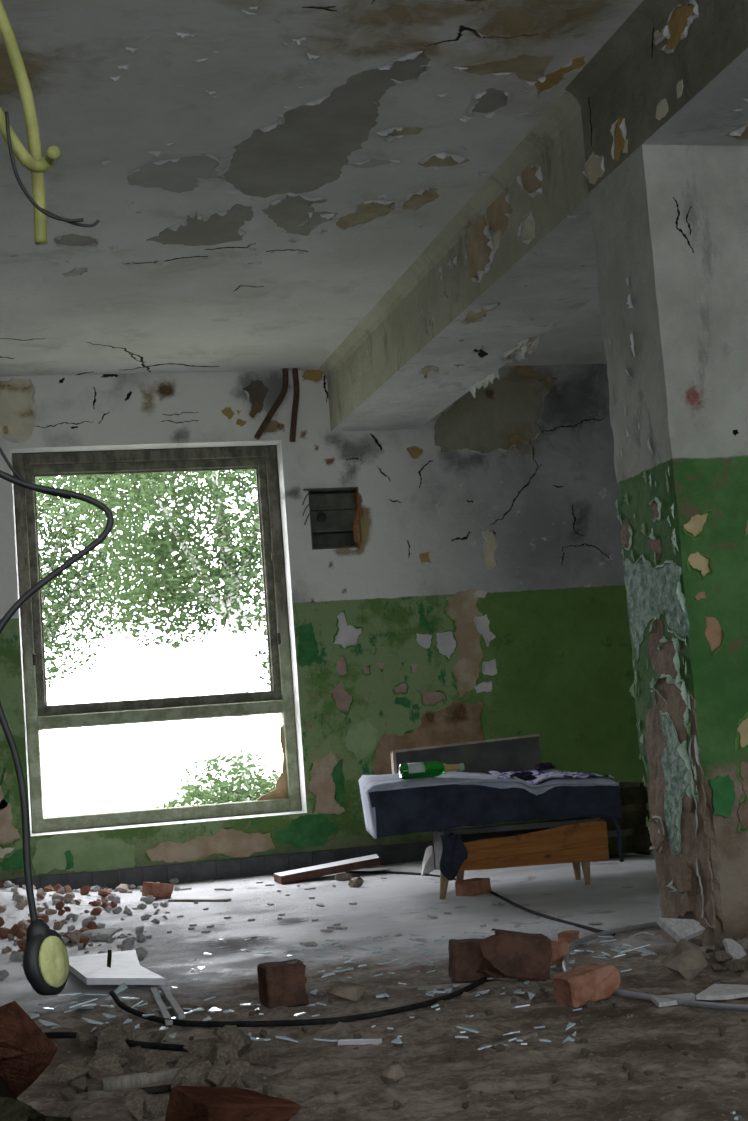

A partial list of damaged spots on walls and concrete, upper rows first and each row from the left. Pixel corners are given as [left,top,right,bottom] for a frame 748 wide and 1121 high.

crack [302,4,337,12]
crack [428,0,539,46]
peeling [653,0,700,54]
peeling [454,54,587,120]
peeling [655,80,683,120]
peeling [127,49,439,246]
peeling [583,117,628,185]
peeling [53,234,100,249]
crack [673,197,694,253]
crack [37,342,219,429]
crack [451,418,611,564]
peeling [615,467,748,929]